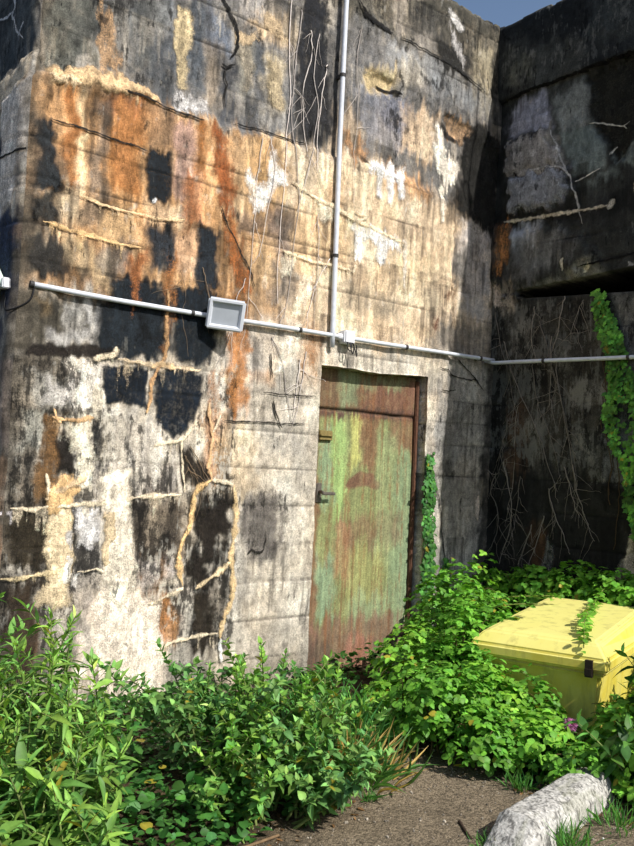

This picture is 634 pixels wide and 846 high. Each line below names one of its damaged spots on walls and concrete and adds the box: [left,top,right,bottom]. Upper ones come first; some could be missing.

crack [0,0,24,38]
water stain [32,120,61,224]
rust [65,89,82,161]
rust [111,97,143,192]
crack [125,89,204,120]
rust [183,120,252,318]
crack [222,0,308,144]
water stain [295,0,332,144]
rust [227,330,250,418]
water stain [2,224,217,686]
crack [0,354,313,663]
water stain [186,494,233,656]